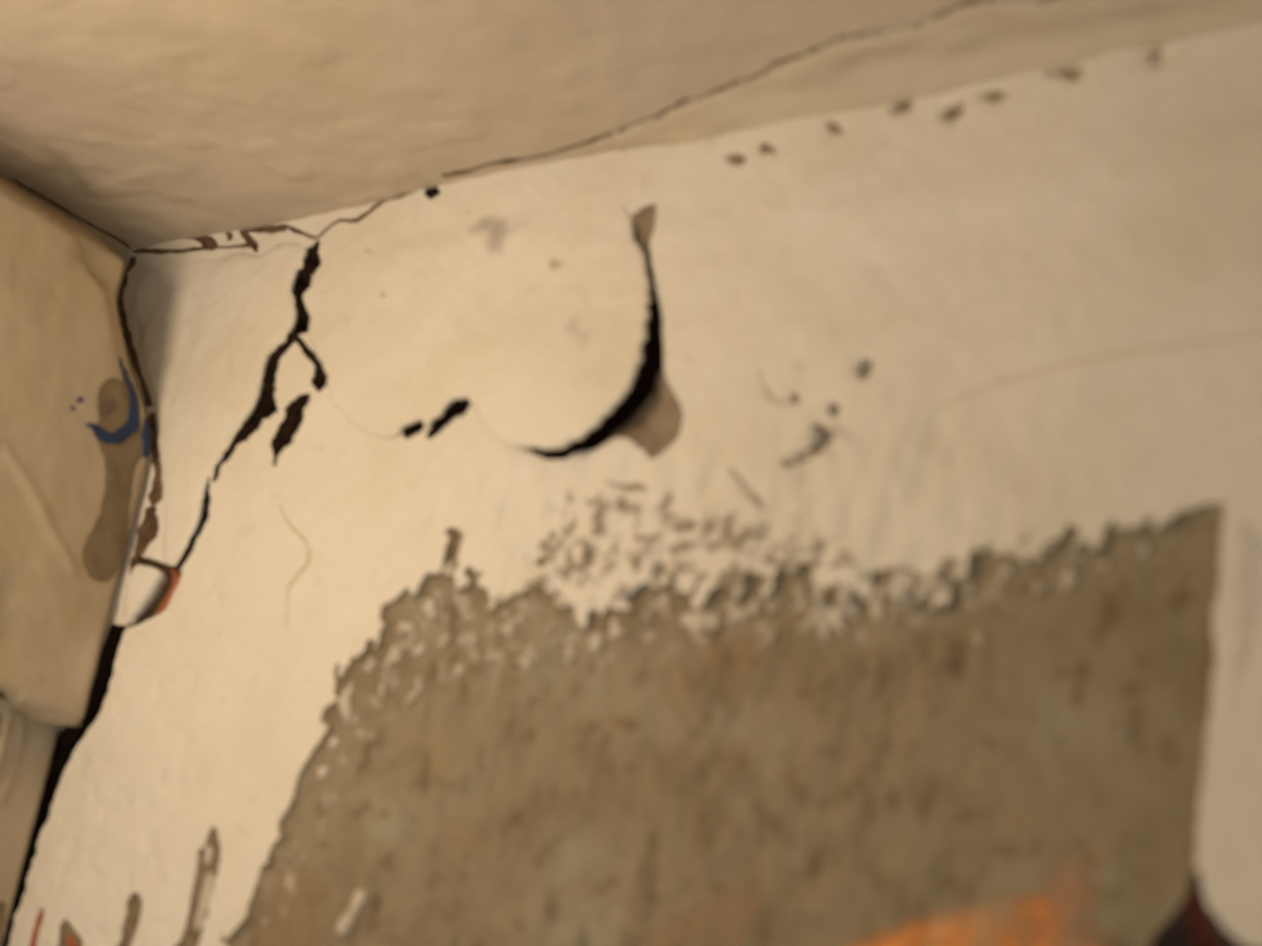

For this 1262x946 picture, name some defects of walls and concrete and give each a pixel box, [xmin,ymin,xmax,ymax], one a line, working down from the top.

crack [12,179,255,560]
crack [174,0,1001,571]
crack [279,504,311,626]
crack [2,624,128,946]